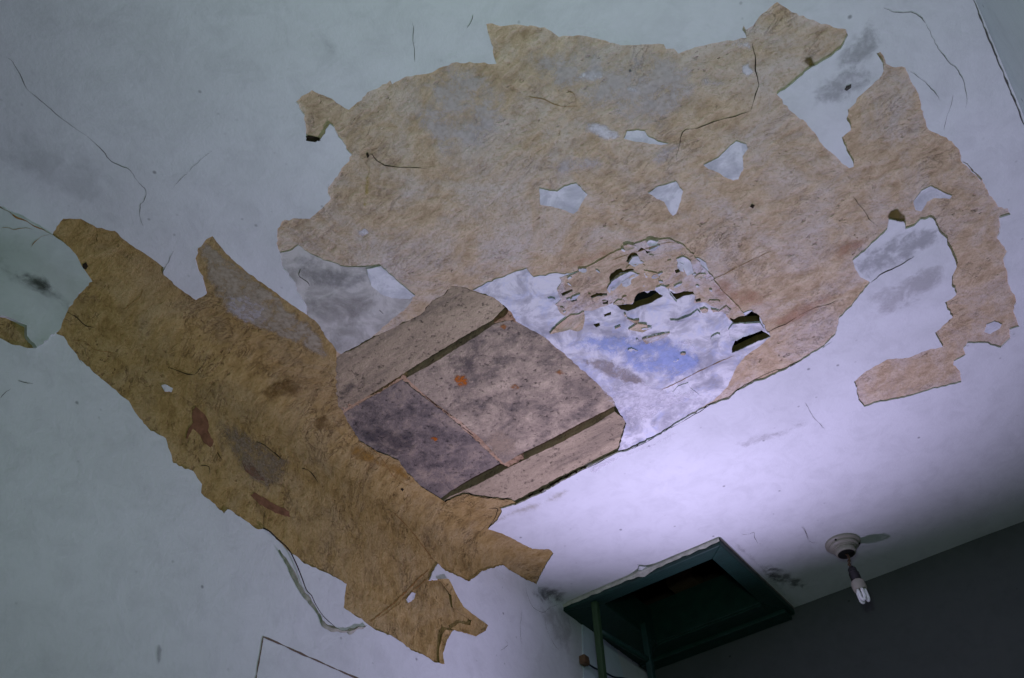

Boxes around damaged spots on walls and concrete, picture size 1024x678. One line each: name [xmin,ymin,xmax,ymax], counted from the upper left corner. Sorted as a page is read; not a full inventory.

crack [8,58,146,225]
peeling [277,2,1019,415]
crack [887,9,967,127]
peeling [0,208,553,663]